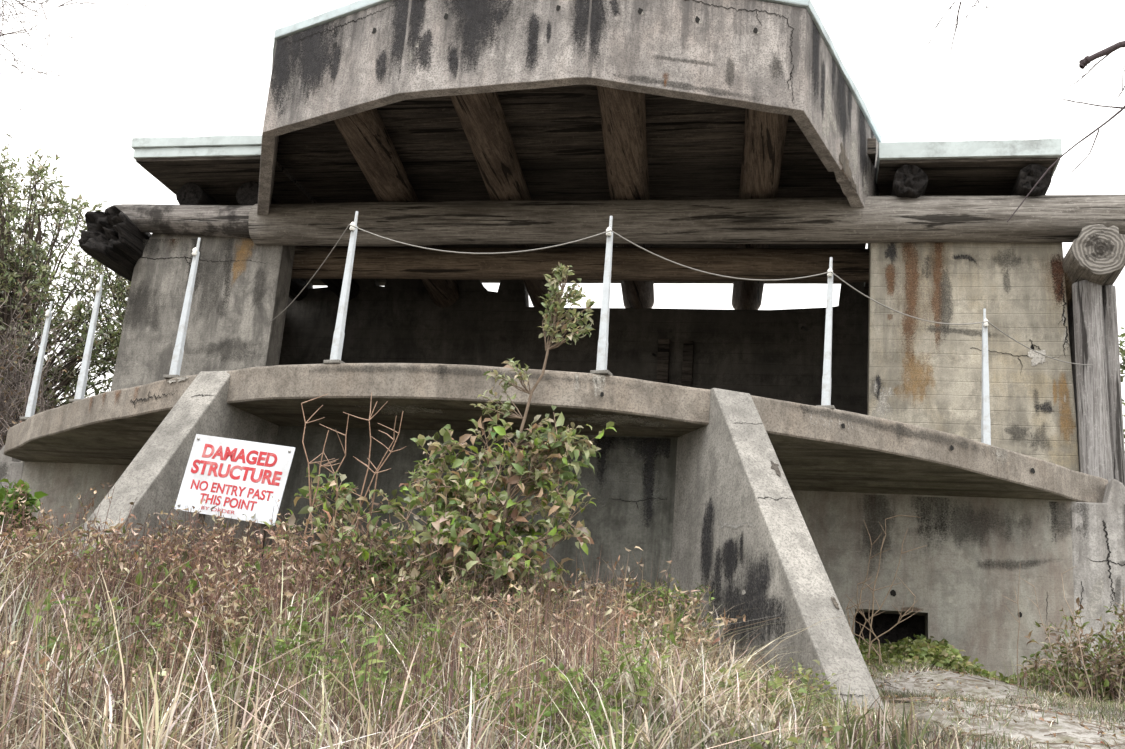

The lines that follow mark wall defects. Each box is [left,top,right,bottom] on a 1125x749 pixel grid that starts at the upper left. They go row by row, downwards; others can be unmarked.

leakage [376,0,432,82]
leakage [446,0,511,75]
leakage [526,14,551,68]
leakage [574,0,619,57]
leakage [628,59,734,95]
rust [886,242,933,400]
rust [933,242,942,341]
rust [1051,254,1065,302]
leakage [700,498,786,657]
crack [1080,520,1125,620]